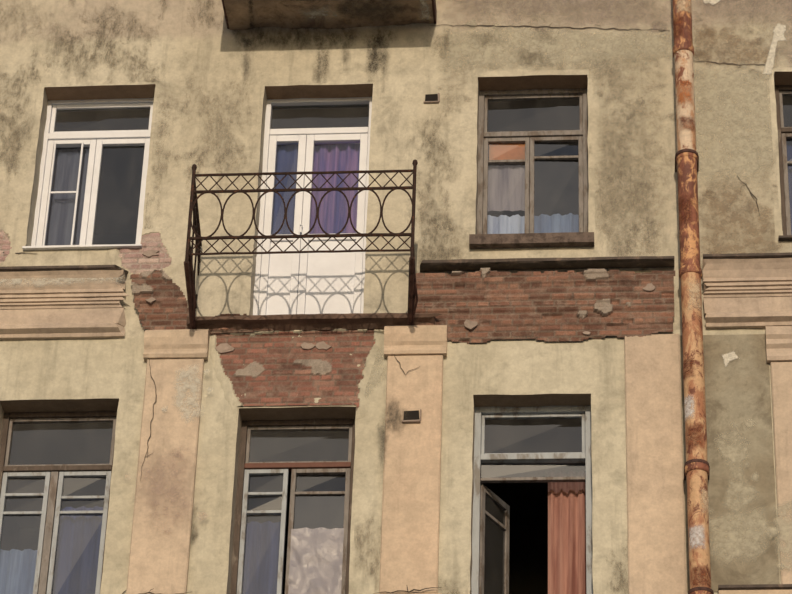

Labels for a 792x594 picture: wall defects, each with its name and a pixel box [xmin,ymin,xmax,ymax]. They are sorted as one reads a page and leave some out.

spalling [0,223,19,267]
spalling [33,227,189,330]
crack [140,358,157,480]
spalling [209,328,384,421]
spalling [414,256,694,466]
crack [373,586,441,594]